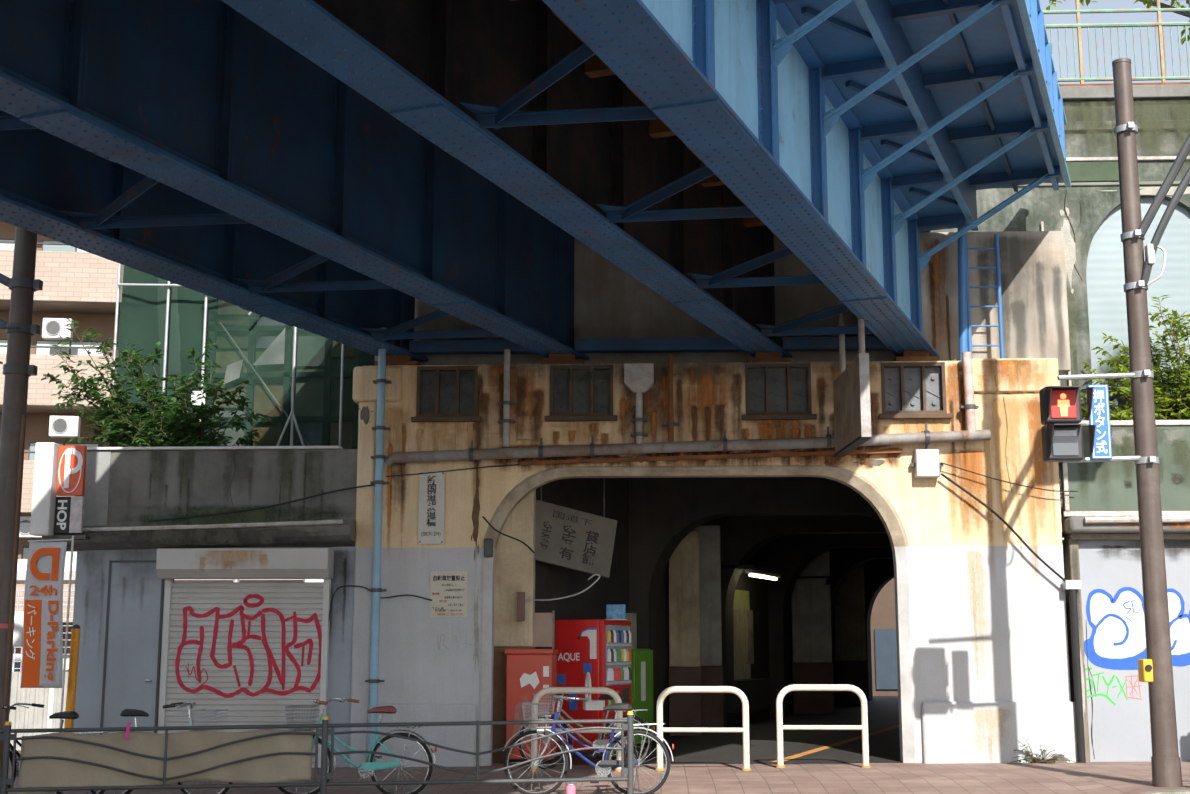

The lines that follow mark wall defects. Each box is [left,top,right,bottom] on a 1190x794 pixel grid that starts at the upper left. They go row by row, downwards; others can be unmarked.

rust [387,409,406,528]
rust [473,366,632,497]
rust [620,364,899,467]
rust [901,241,1054,539]